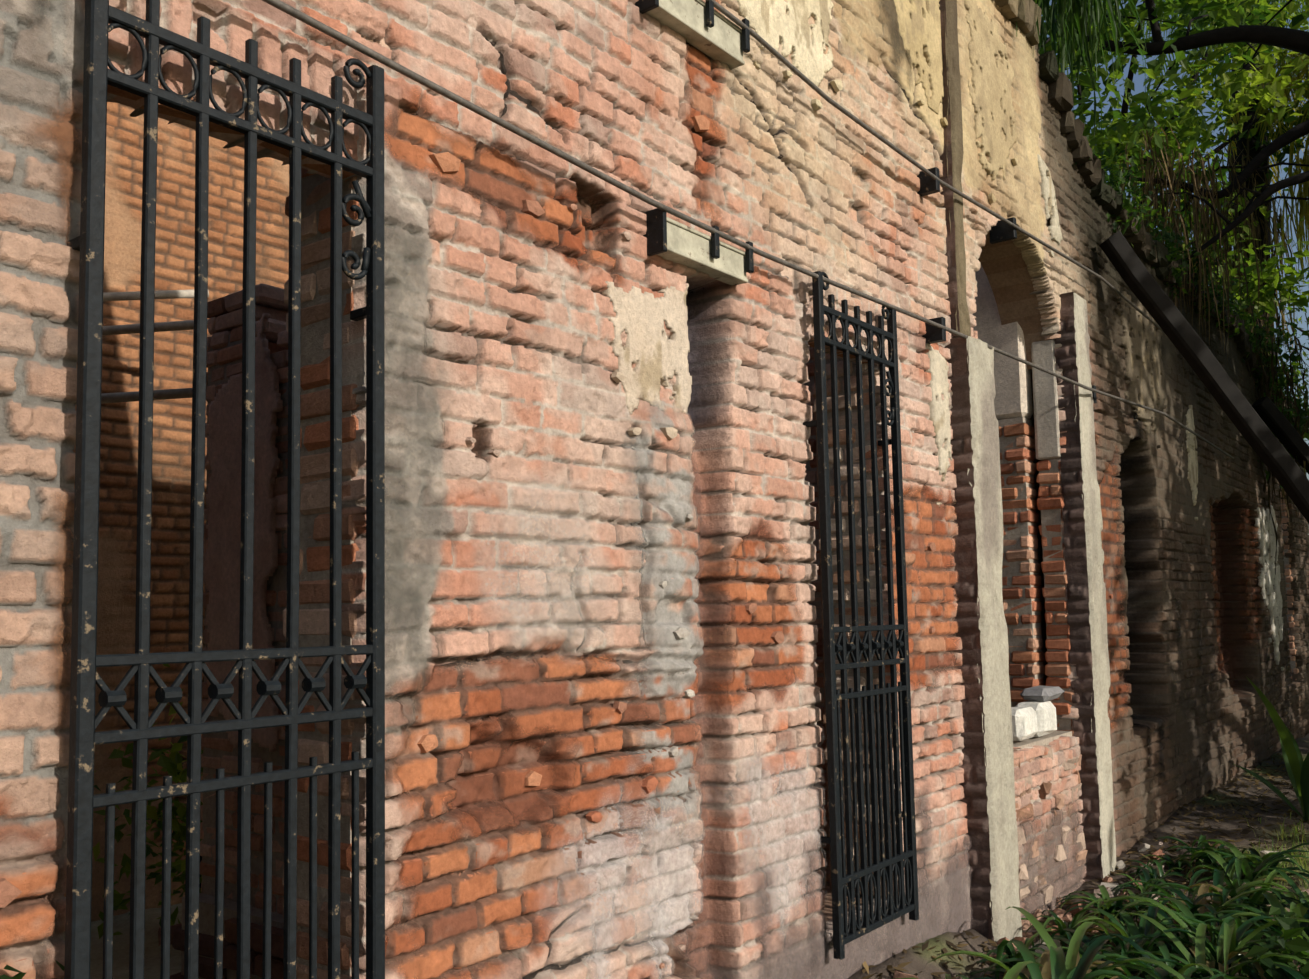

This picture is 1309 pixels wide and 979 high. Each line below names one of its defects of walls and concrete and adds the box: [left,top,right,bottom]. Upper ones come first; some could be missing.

crack [485,38,559,132]
spalling [384,95,692,440]
spalling [684,41,721,209]
peeling [736,0,843,110]
peeling [894,0,948,127]
peeling [964,0,1018,204]
peeling [1037,154,1063,257]
spalling [465,428,501,459]
peeling [1254,506,1284,671]
spalling [385,525,802,979]